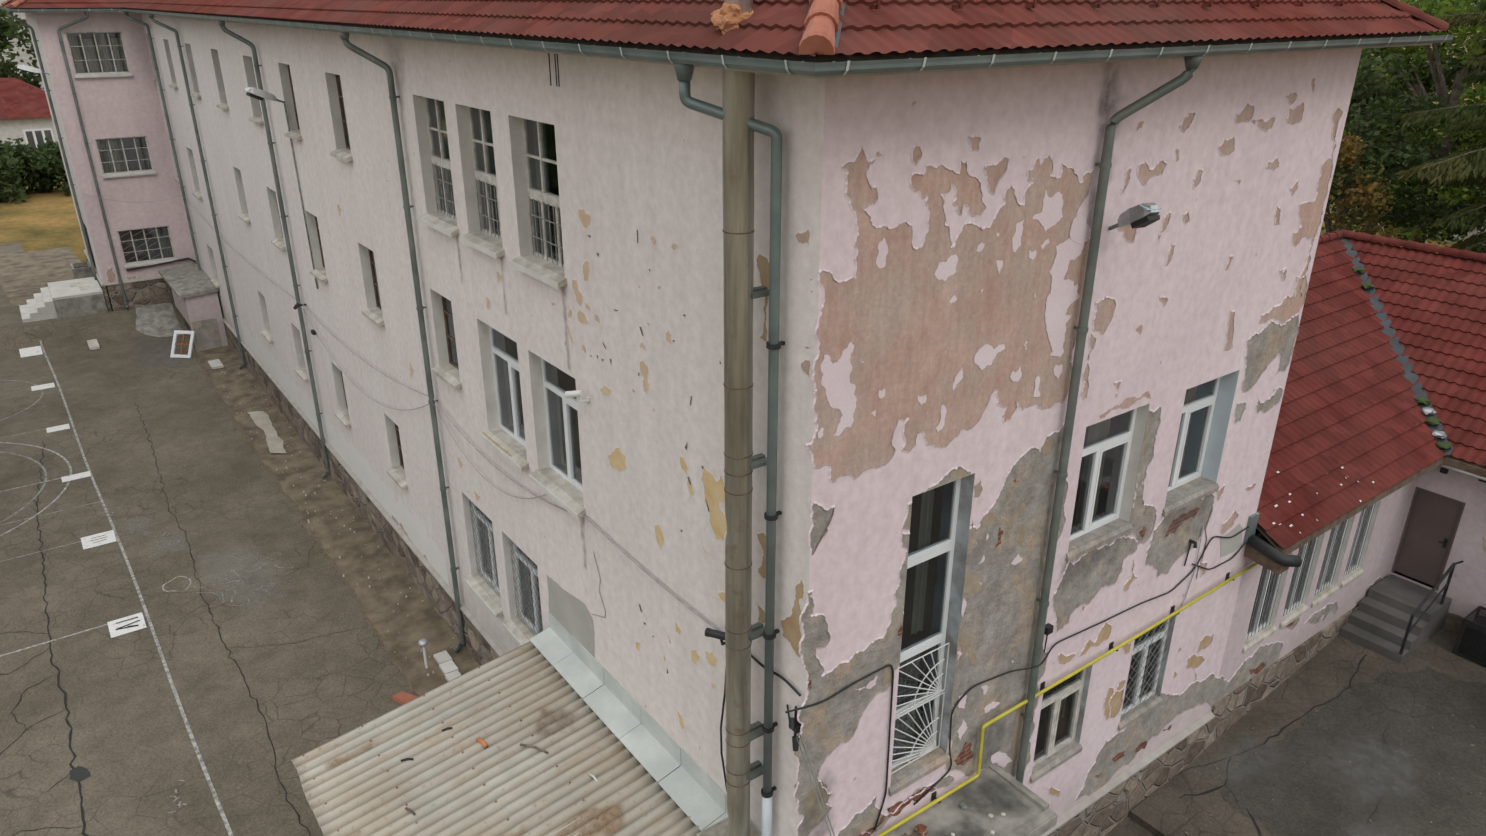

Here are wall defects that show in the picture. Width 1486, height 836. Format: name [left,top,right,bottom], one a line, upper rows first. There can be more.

peeling [1120,111,1195,195]
peeling [1218,78,1316,156]
peeling [551,207,618,364]
peeling [755,253,769,343]
peeling [800,134,1116,483]
peeling [1117,220,1137,244]
flaking render [1223,107,1344,424]
peeling [608,446,627,473]
peeling [679,443,727,554]
flaking render [756,380,1240,836]
crack [0,631,65,755]
crack [12,826,81,836]